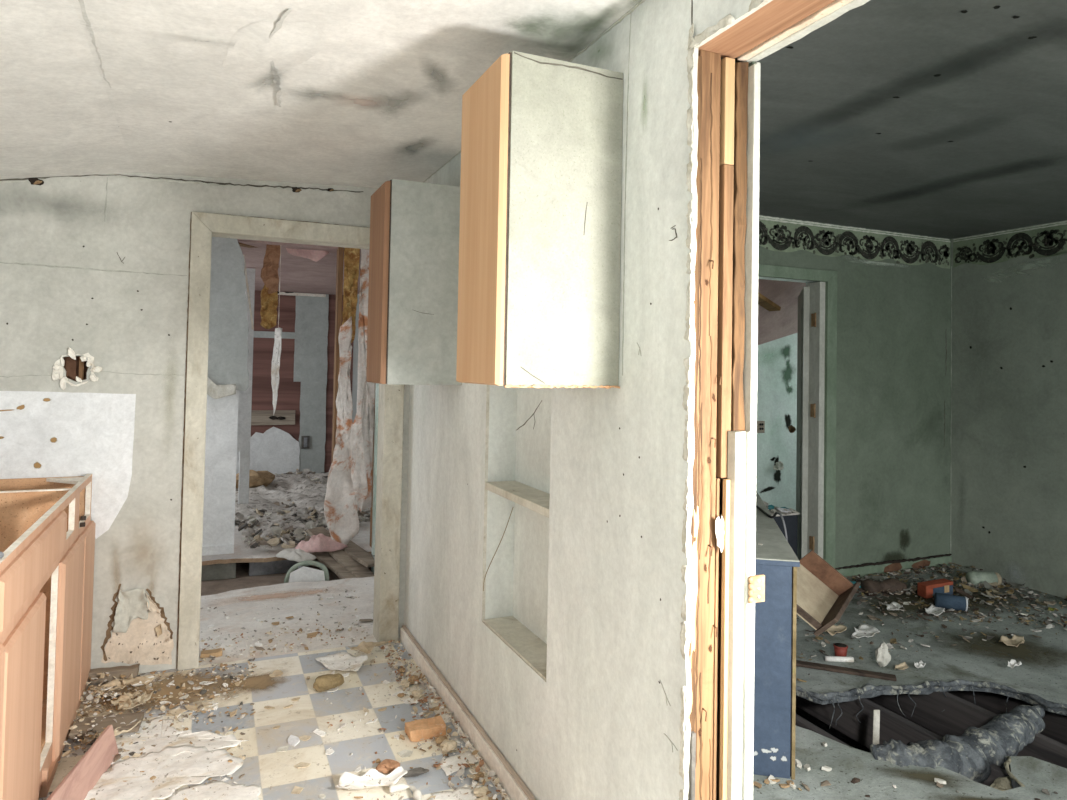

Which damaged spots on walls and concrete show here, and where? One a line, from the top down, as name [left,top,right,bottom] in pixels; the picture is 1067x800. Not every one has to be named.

crack [78,0,111,88]
spalling [51,347,102,390]
leakage [883,530,909,562]
flaking render [101,584,174,665]